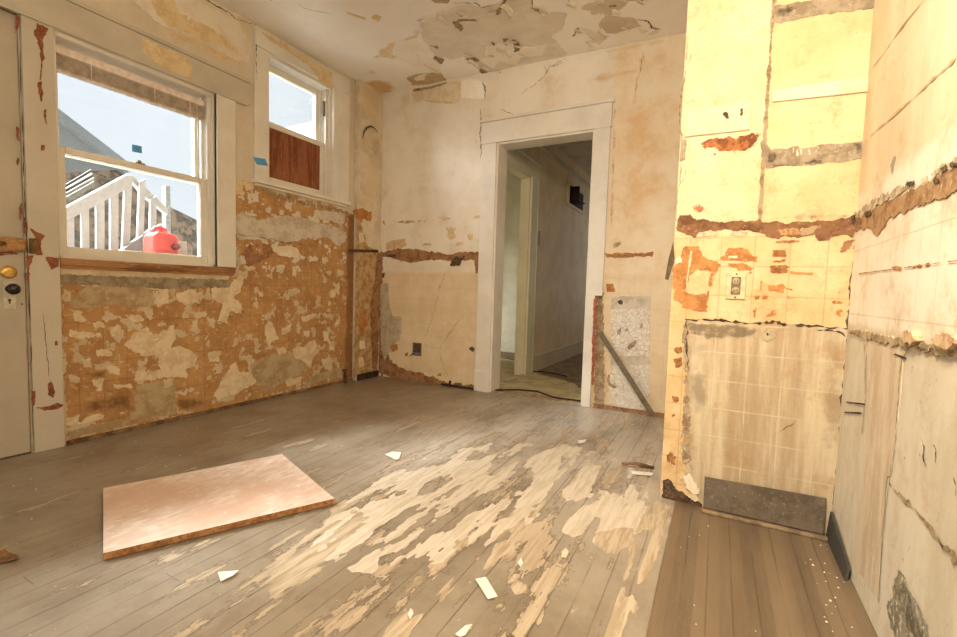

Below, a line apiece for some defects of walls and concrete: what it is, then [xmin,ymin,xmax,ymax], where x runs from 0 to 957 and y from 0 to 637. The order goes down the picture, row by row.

flaking render [0,179,347,324]
peeling [31,382,63,411]
flaking render [65,414,104,426]
flaking render [69,309,257,400]